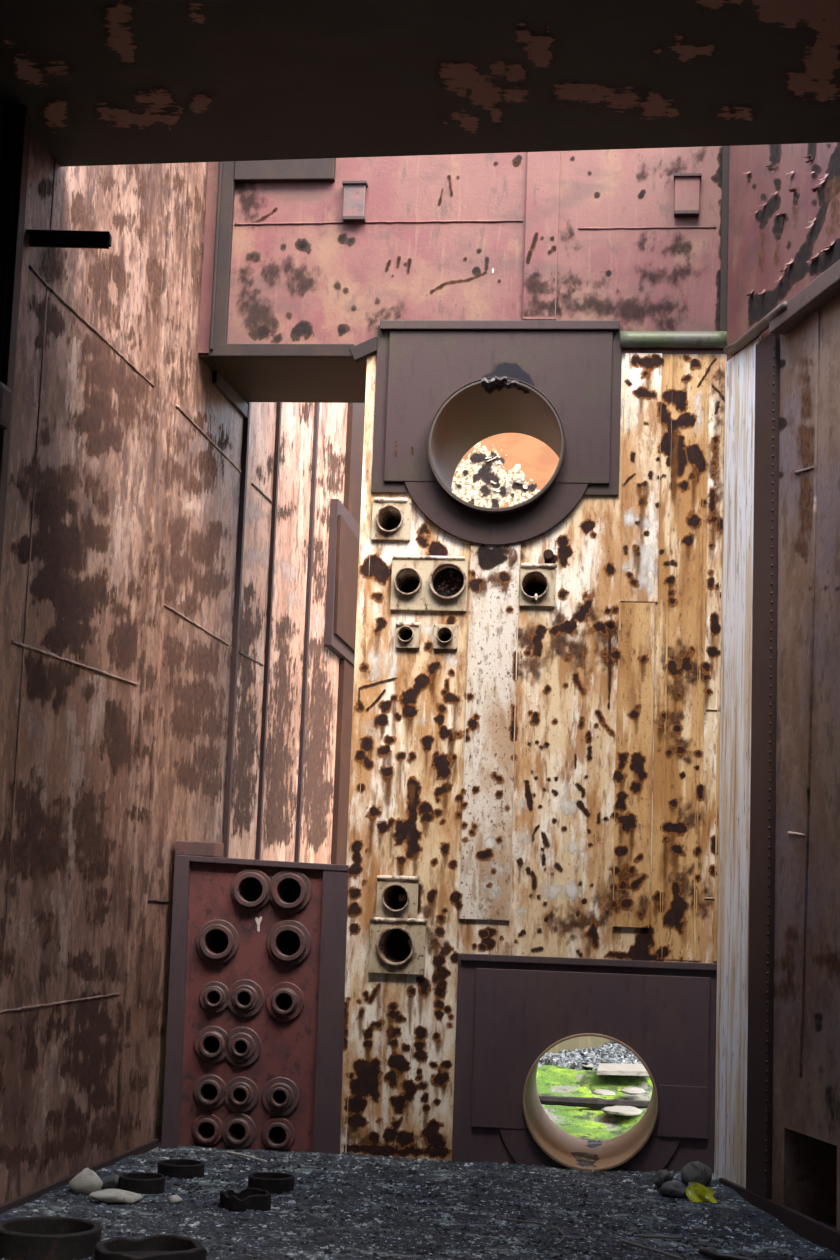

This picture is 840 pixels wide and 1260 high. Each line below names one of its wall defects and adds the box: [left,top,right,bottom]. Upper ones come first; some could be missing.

peeling [438,22,557,138]
peeling [553,82,680,122]
peeling [695,0,840,103]
peeling [743,142,840,340]
damp [61,336,84,466]
damp [105,495,132,597]
corrosion [0,247,338,927]
damp [245,544,325,632]
corrosion [630,354,723,559]
damp [45,673,106,975]
corrosion [342,641,504,1159]
corrosion [584,751,718,962]